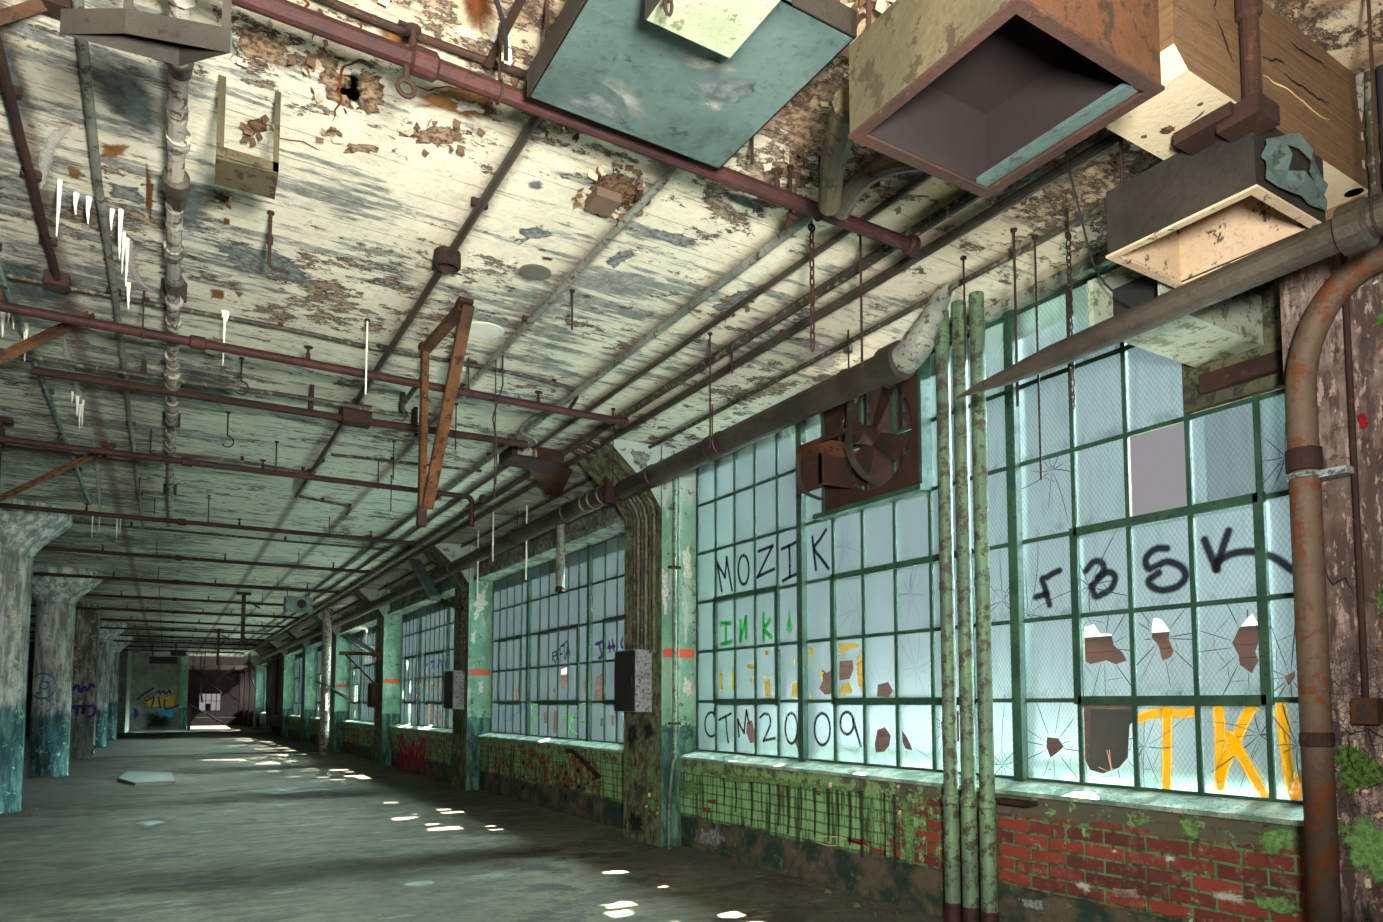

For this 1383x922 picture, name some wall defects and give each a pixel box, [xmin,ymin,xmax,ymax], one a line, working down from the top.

peeling [231,15,385,116]
flaking render [453,26,528,89]
spalling [239,114,274,147]
peeling [316,98,492,157]
peeling [1334,740,1383,798]
peeling [1337,812,1383,907]